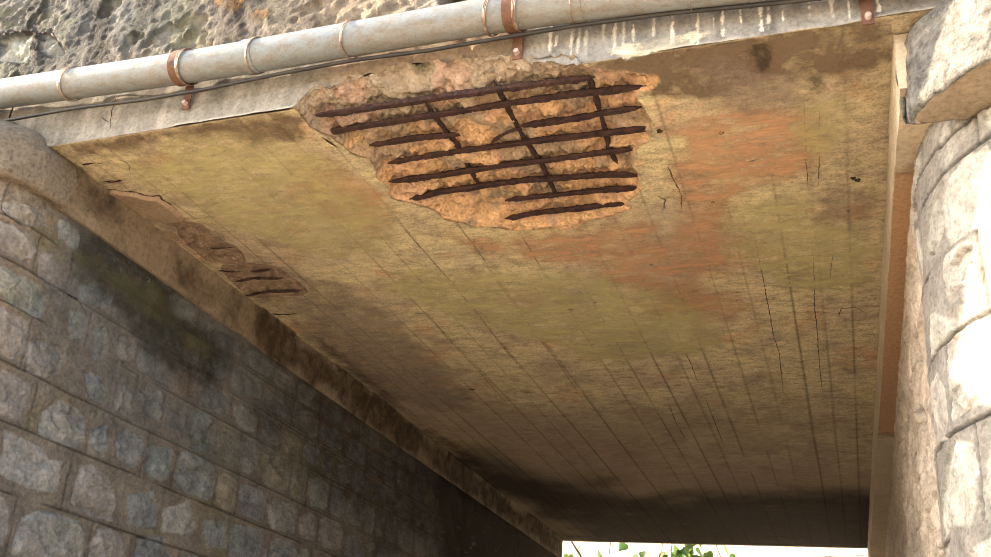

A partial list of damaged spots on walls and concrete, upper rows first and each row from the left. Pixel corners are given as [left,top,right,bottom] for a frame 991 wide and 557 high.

leakage [548,26,588,53]
leakage [597,0,886,98]
spalling [290,51,663,231]
crack [656,164,682,213]
crack [803,103,820,185]
spalling [172,222,308,298]
crack [754,238,784,393]
crack [812,245,860,394]